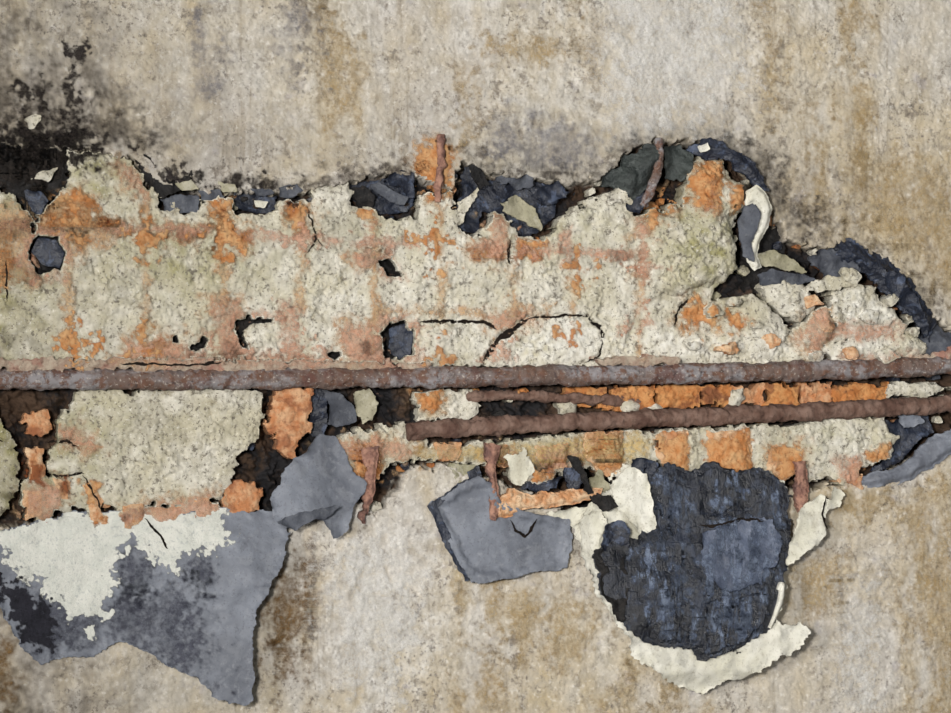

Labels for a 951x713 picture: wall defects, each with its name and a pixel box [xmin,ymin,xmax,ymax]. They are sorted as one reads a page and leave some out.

water stain [0,37,109,160]
water stain [155,160,207,187]
rust [0,137,753,371]
crack [421,313,605,363]
rust [338,431,423,482]
rust [408,388,447,414]
spalling [0,150,951,706]
rust [433,427,754,483]